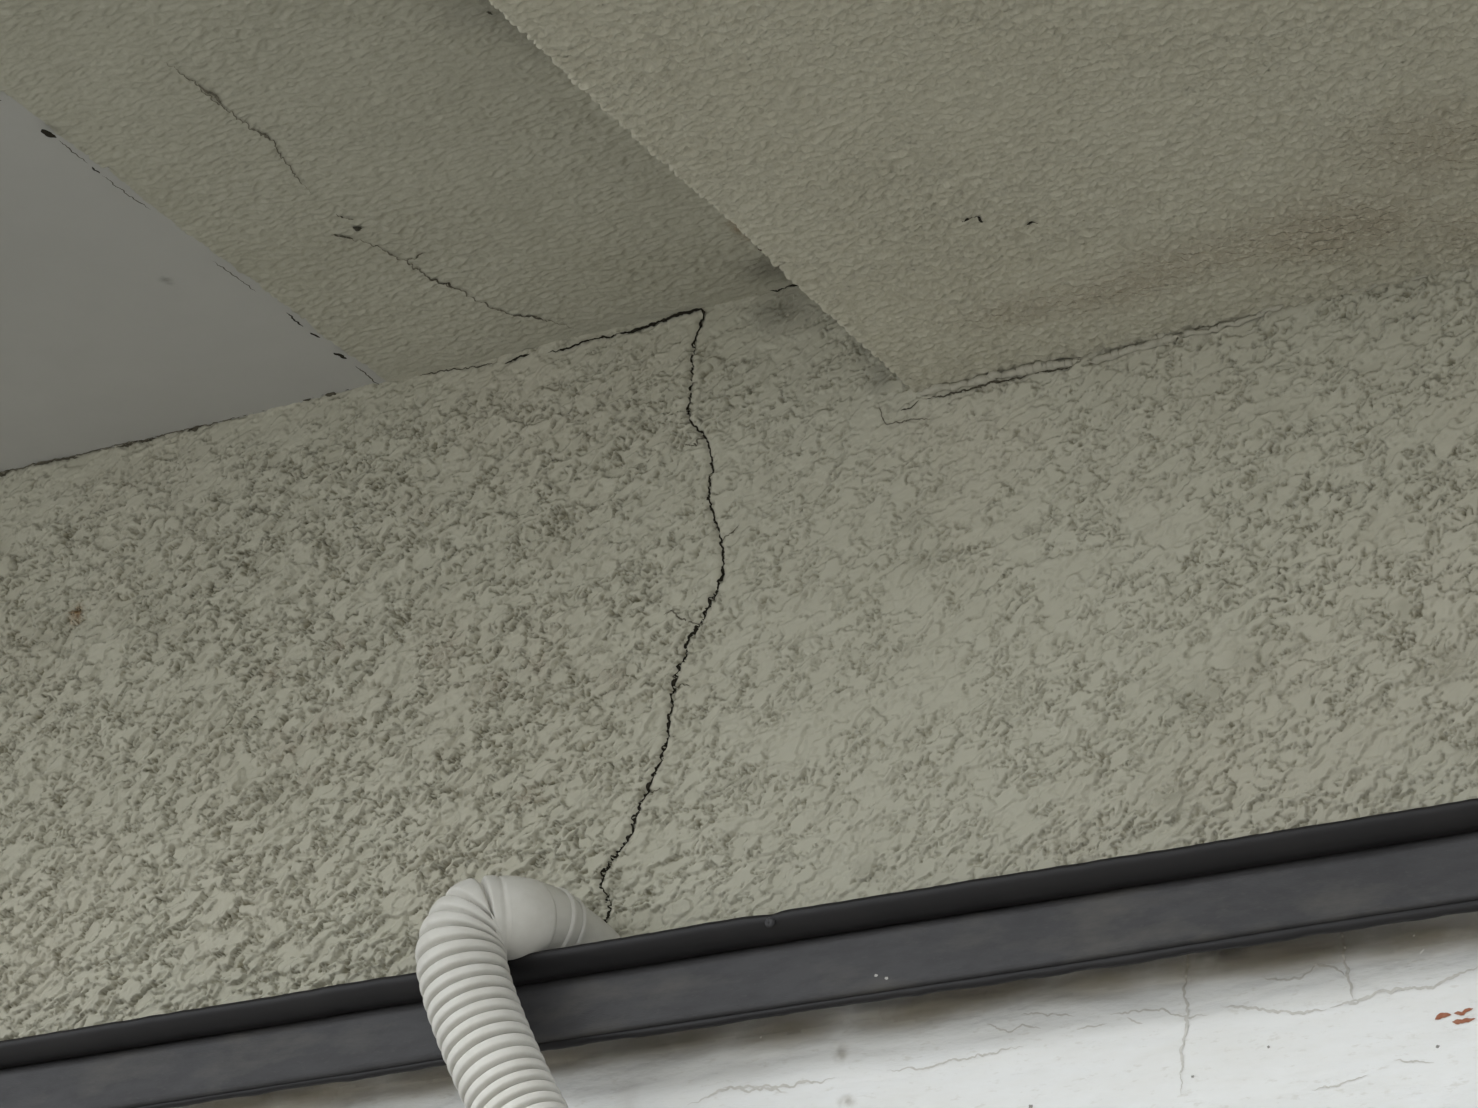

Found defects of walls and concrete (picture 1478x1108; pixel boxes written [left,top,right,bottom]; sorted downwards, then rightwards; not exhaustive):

crack [167,64,739,923]
crack [892,932,1477,1091]